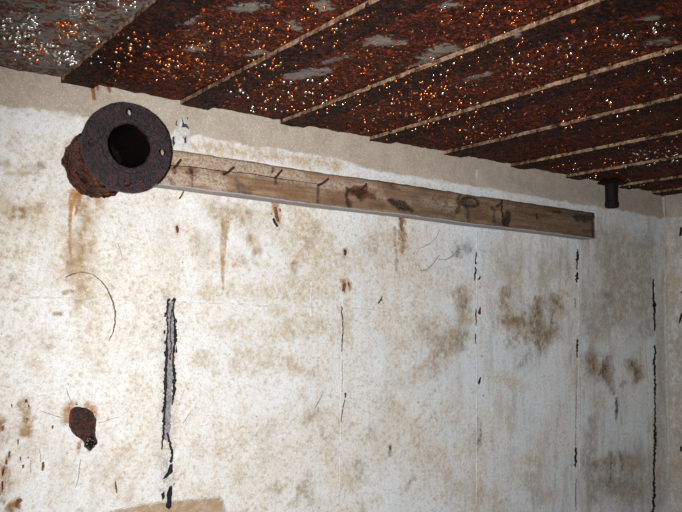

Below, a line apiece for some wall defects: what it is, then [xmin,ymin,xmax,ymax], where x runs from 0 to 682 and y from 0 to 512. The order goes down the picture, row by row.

corrosion [67,189,94,276]
crack [161,298,178,509]
crack [475,307,483,357]
crack [572,249,580,308]
crack [572,339,580,509]
crack [650,279,658,512]